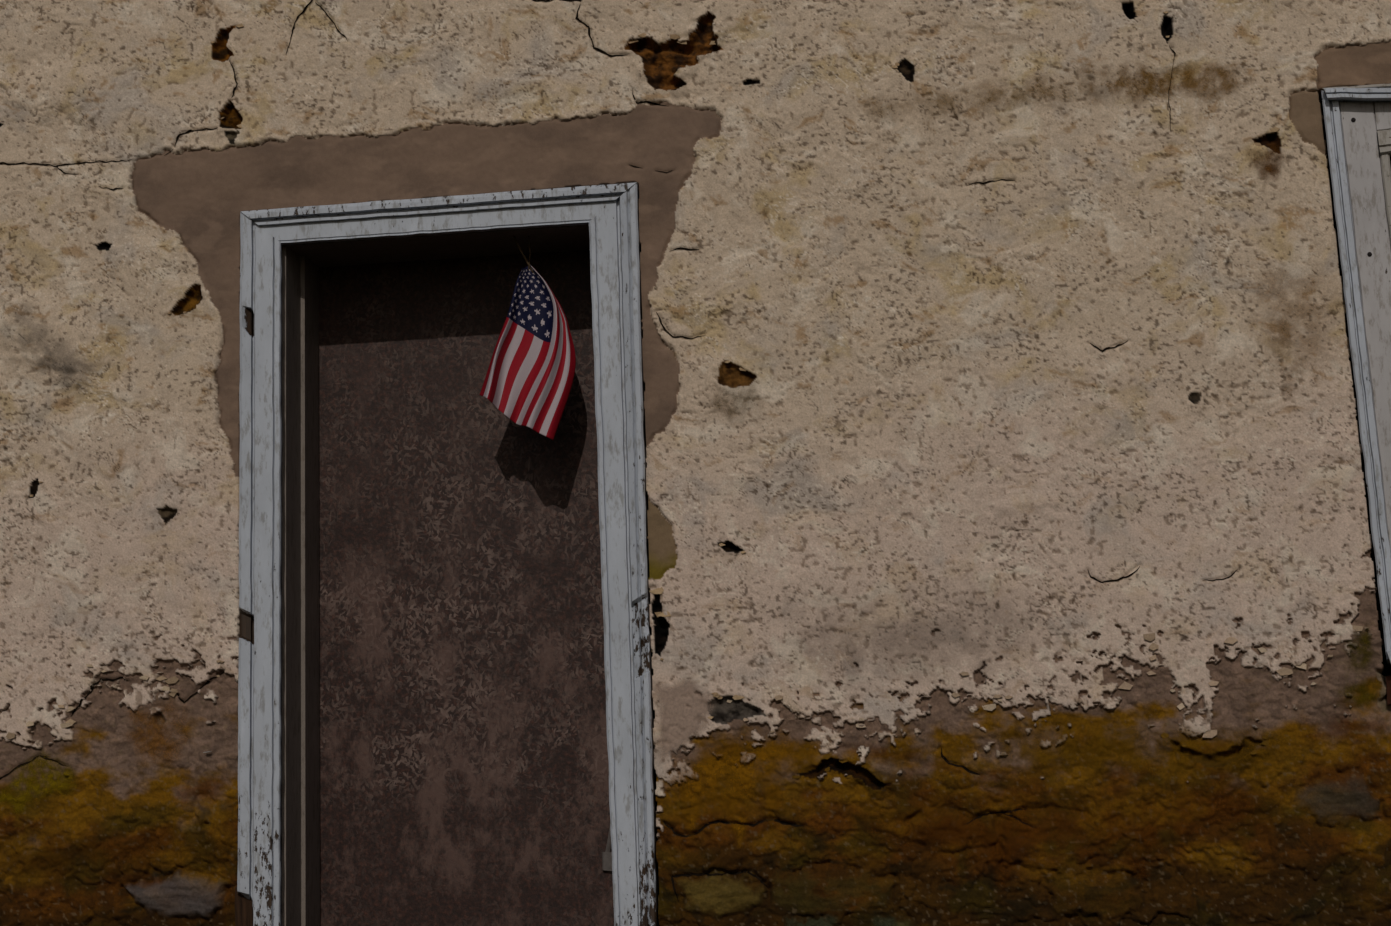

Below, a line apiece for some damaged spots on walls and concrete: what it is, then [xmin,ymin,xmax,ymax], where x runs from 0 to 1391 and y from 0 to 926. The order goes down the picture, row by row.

crack [286,0,347,54]
crack [533,0,624,57]
spalling [625,11,724,92]
crack [632,92,666,106]
spalling [168,284,203,316]
spalling [718,541,746,554]
spalling [650,587,671,661]
spalling [0,636,239,926]
damp [658,681,711,755]
spalling [656,579,1391,926]